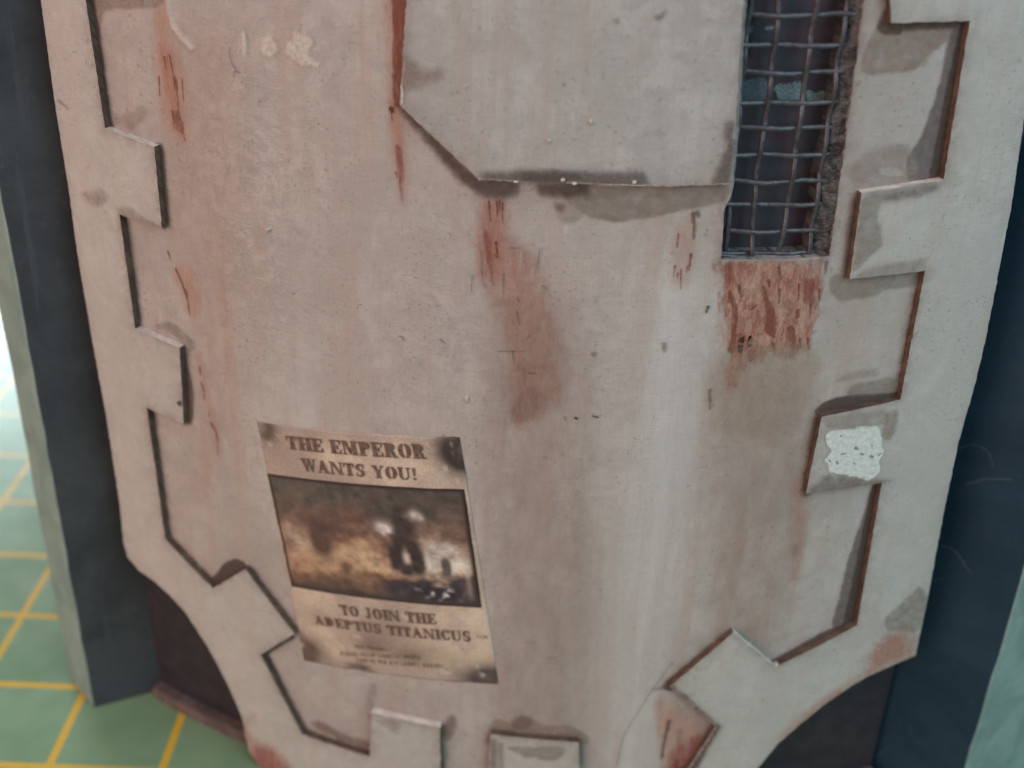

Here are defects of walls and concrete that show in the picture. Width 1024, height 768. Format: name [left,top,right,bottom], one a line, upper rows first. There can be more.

corrosion [391,0,407,112]
damp [402,109,735,221]
corrosion [718,261,828,389]
peeling [825,425,884,481]